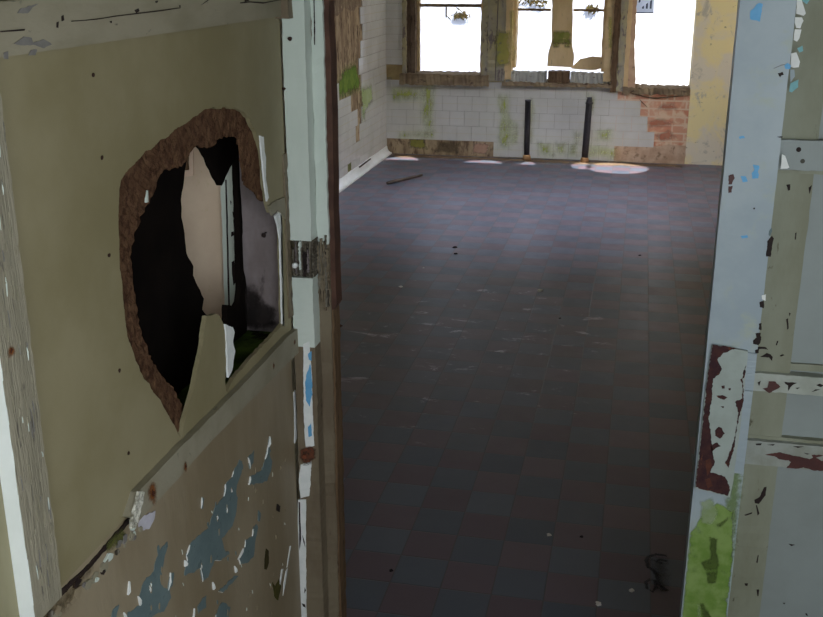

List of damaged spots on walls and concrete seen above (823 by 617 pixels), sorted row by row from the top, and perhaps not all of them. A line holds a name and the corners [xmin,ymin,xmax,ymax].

peeling [334,0,364,142]
peeling [775,0,809,92]
flaking render [612,91,690,164]
peeling [293,342,314,447]
peeling [758,381,798,393]
corrosion [300,446,315,463]
peeling [756,443,823,471]
peeling [44,511,155,617]
peeling [111,542,174,617]
peeling [182,436,286,617]
peeling [264,461,312,617]
water stain [702,537,719,583]